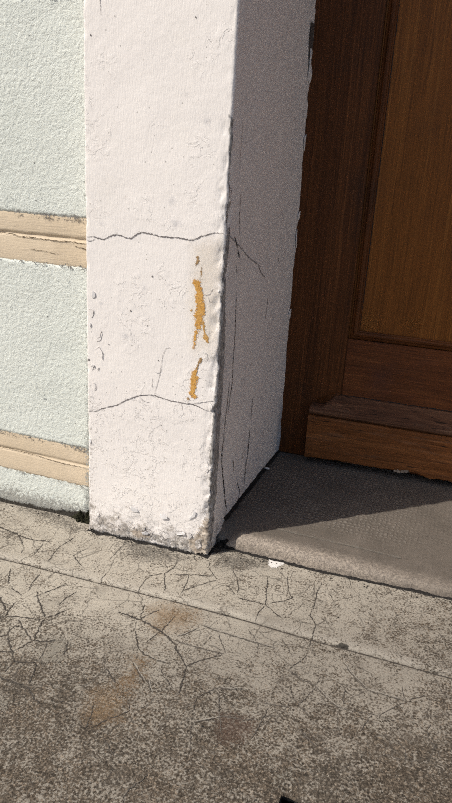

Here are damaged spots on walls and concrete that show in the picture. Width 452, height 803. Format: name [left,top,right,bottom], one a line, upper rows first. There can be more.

crack [0,232,279,277]
rust [190,256,209,349]
crack [95,292,253,511]
rust [186,358,202,400]
crack [0,523,85,704]
crack [118,563,424,749]
crack [86,703,130,776]